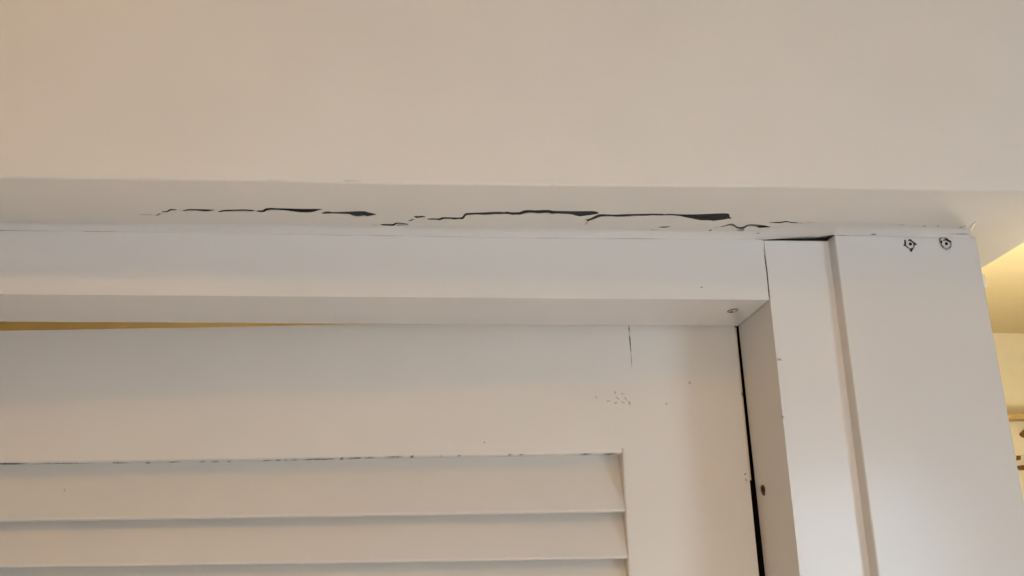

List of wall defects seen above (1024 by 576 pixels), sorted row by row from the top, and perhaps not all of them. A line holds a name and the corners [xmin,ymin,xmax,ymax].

crack [157,208,846,296]